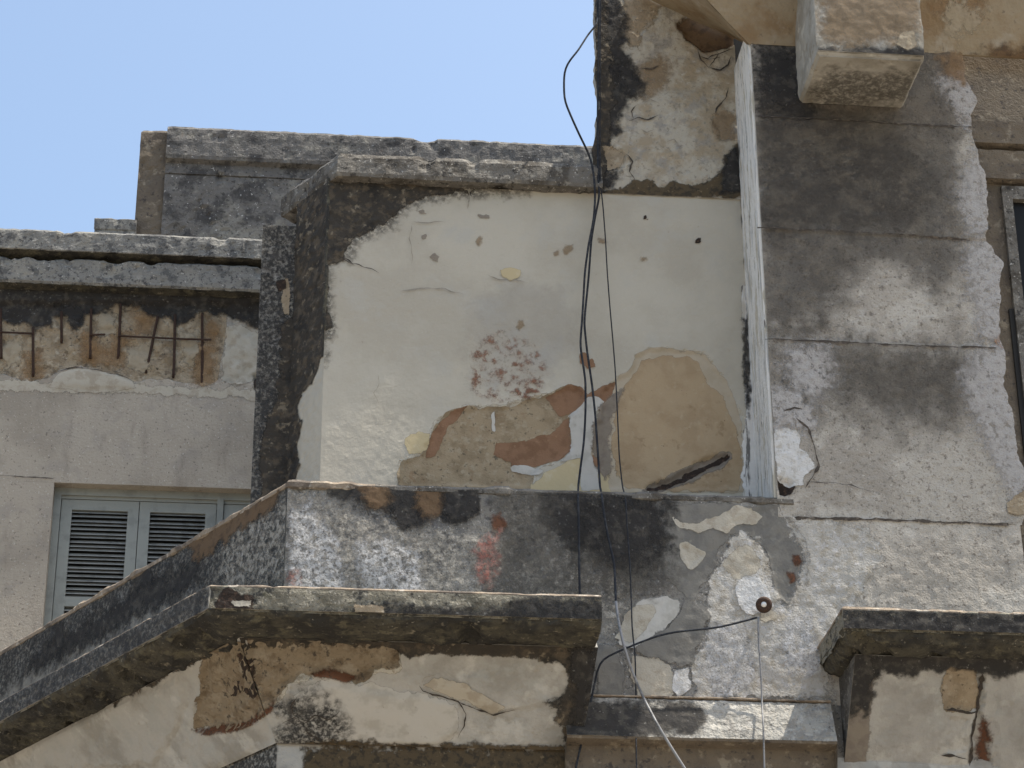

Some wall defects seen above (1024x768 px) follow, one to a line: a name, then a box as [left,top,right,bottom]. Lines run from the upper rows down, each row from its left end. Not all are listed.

spalling [676,18,734,52]
water stain [935,74,978,130]
spalling [0,303,227,386]
water stain [778,148,1024,499]
water stain [0,178,522,721]
crack [784,407,871,492]
water stain [319,492,678,619]
peeling [218,285,884,704]
crack [795,516,1009,526]
flaking render [193,638,402,736]
crack [420,675,513,737]
spalling [940,667,979,713]